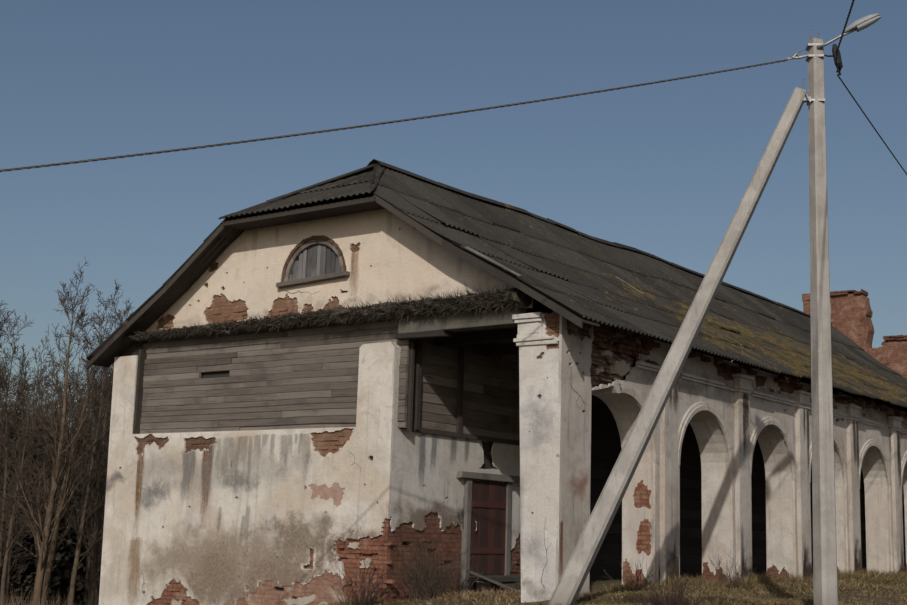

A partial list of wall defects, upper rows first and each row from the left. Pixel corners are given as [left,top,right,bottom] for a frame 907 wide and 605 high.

spalling [190,283,249,324]
spalling [265,290,348,318]
spalling [157,314,175,329]
flaking render [591,350,658,377]
spalling [311,428,353,457]
flaking render [306,483,345,508]
spalling [633,480,652,556]
leakage [150,519,329,605]
spalling [236,512,462,605]
spalling [510,534,521,583]
spalling [622,558,649,588]
spalling [144,579,200,605]